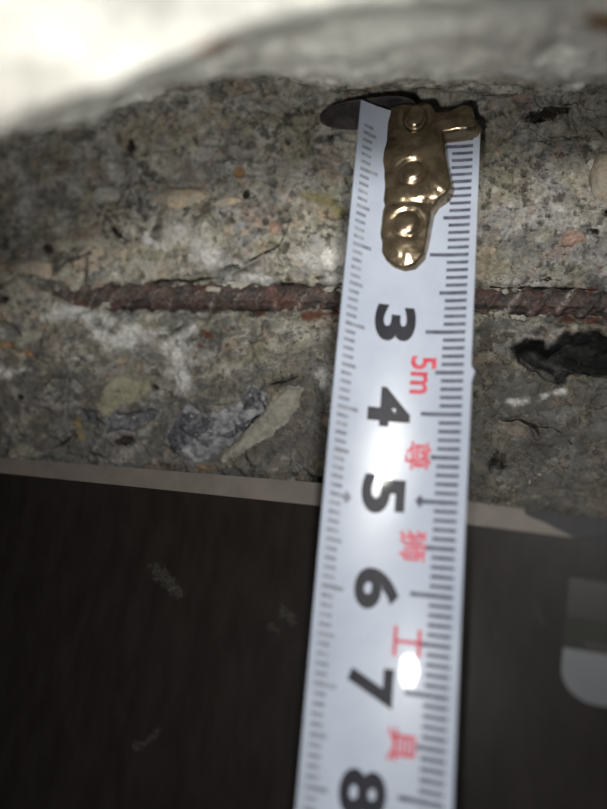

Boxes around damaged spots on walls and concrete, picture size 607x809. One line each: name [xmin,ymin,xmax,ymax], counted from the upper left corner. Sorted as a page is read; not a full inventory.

spalling [0,72,607,483]
corrosion [302,311,340,321]
spalling [467,309,607,519]